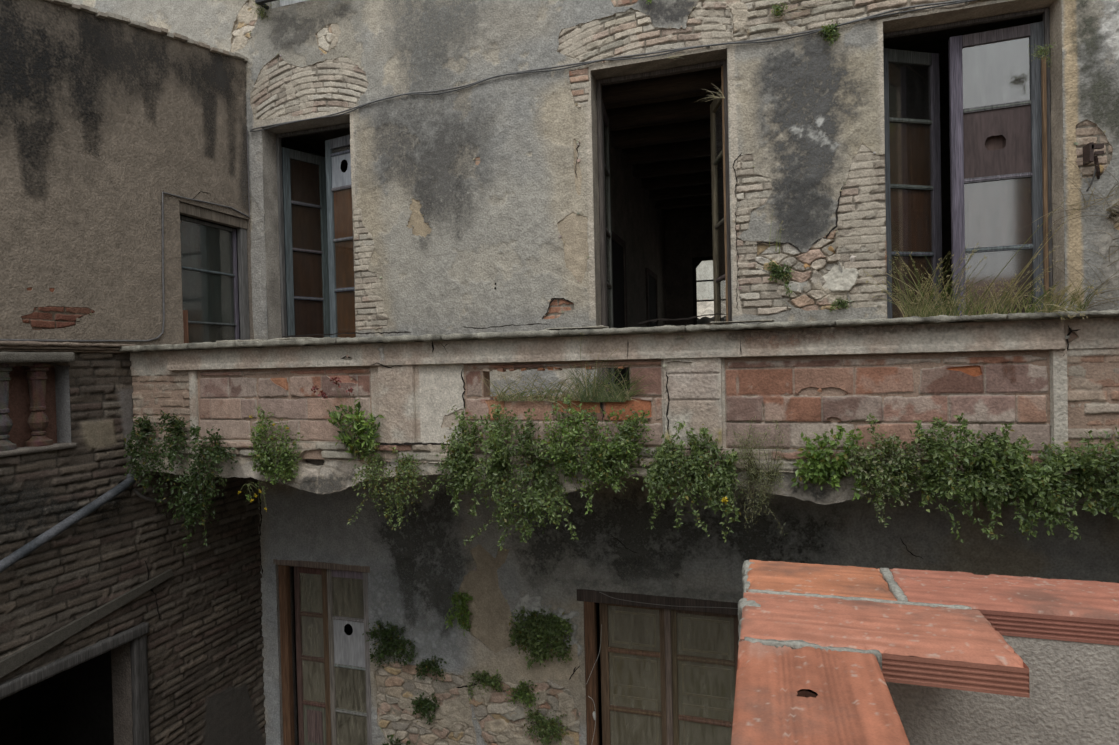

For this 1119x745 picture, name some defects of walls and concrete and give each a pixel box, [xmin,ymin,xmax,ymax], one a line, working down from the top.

damp [0,0,238,195]
damp [230,104,249,209]
spalling [250,23,369,120]
damp [376,111,478,222]
spalling [557,0,996,107]
damp [758,35,861,248]
spalling [1074,119,1113,178]
damp [1073,0,1119,138]
spalling [21,306,95,330]
spalling [353,208,389,331]
spalling [734,143,887,316]
spalling [374,544,581,745]